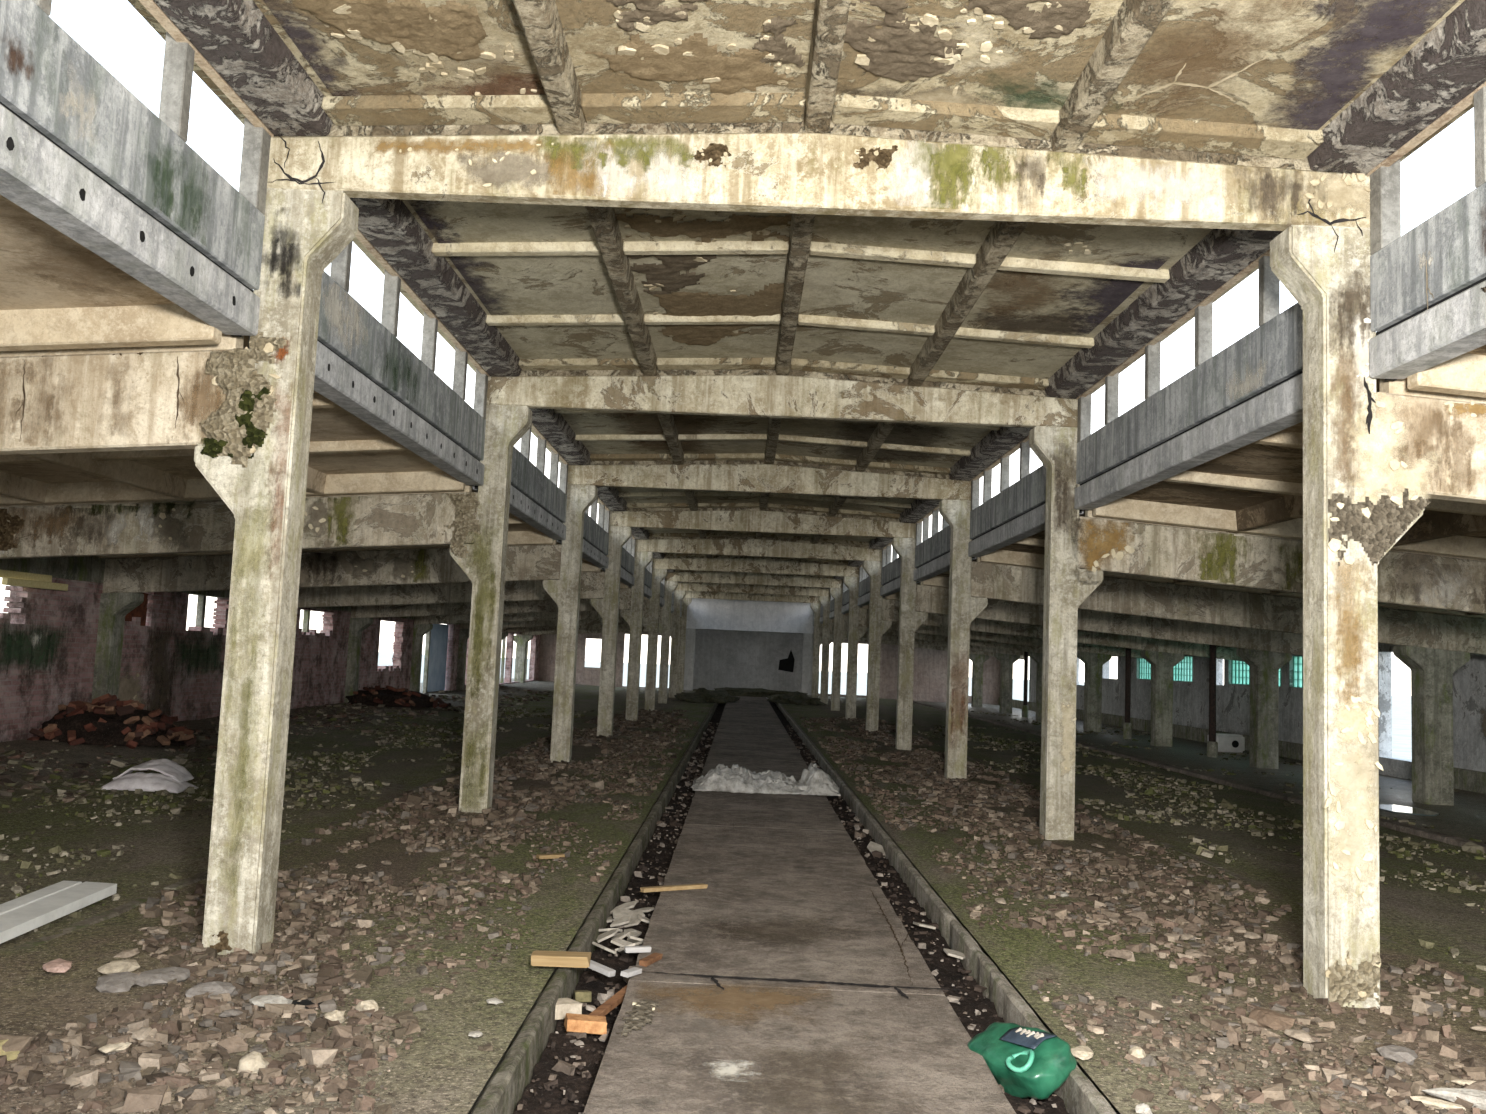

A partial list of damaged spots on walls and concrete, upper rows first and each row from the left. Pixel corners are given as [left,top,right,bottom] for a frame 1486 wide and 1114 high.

leakage [442,75,546,96]
leakage [1140,9,1271,113]
leakage [1266,0,1457,131]
crack [273,137,334,202]
spalling [693,143,731,168]
spalling [853,145,898,171]
leakage [889,141,1044,209]
crack [1297,193,1366,252]
leakage [265,230,301,294]
spalling [199,331,287,468]
peeling [1327,309,1438,566]
spalling [0,508,25,551]